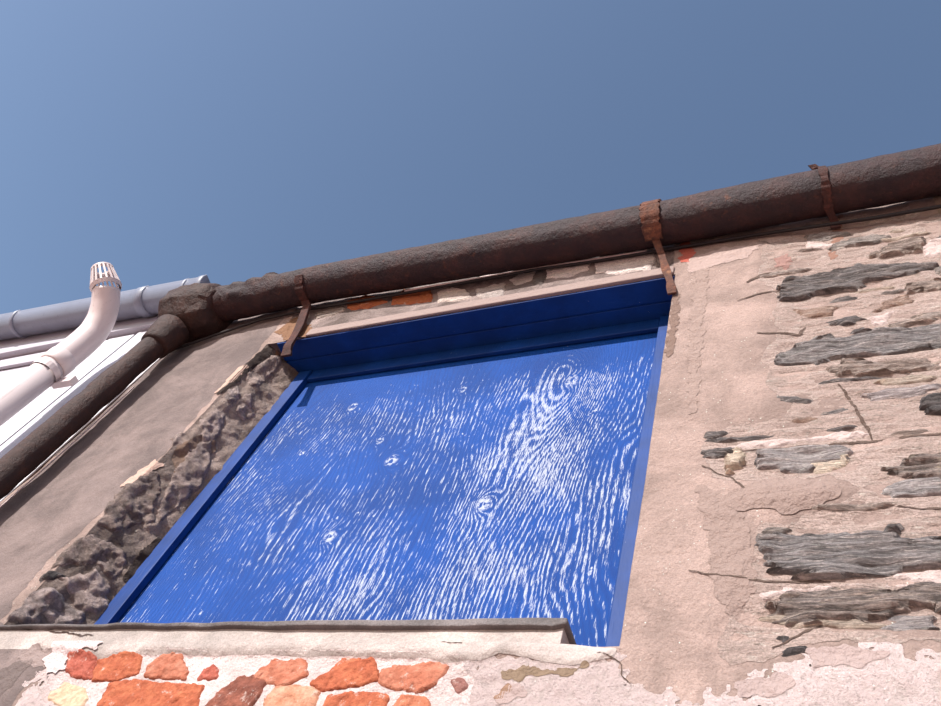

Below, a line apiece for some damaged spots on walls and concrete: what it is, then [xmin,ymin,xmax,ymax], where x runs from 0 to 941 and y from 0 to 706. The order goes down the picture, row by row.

corrosion [678,241,696,262]
corrosion [275,316,312,340]
crack [827,384,941,446]
spalling [698,206,941,668]
spalling [734,672,796,698]